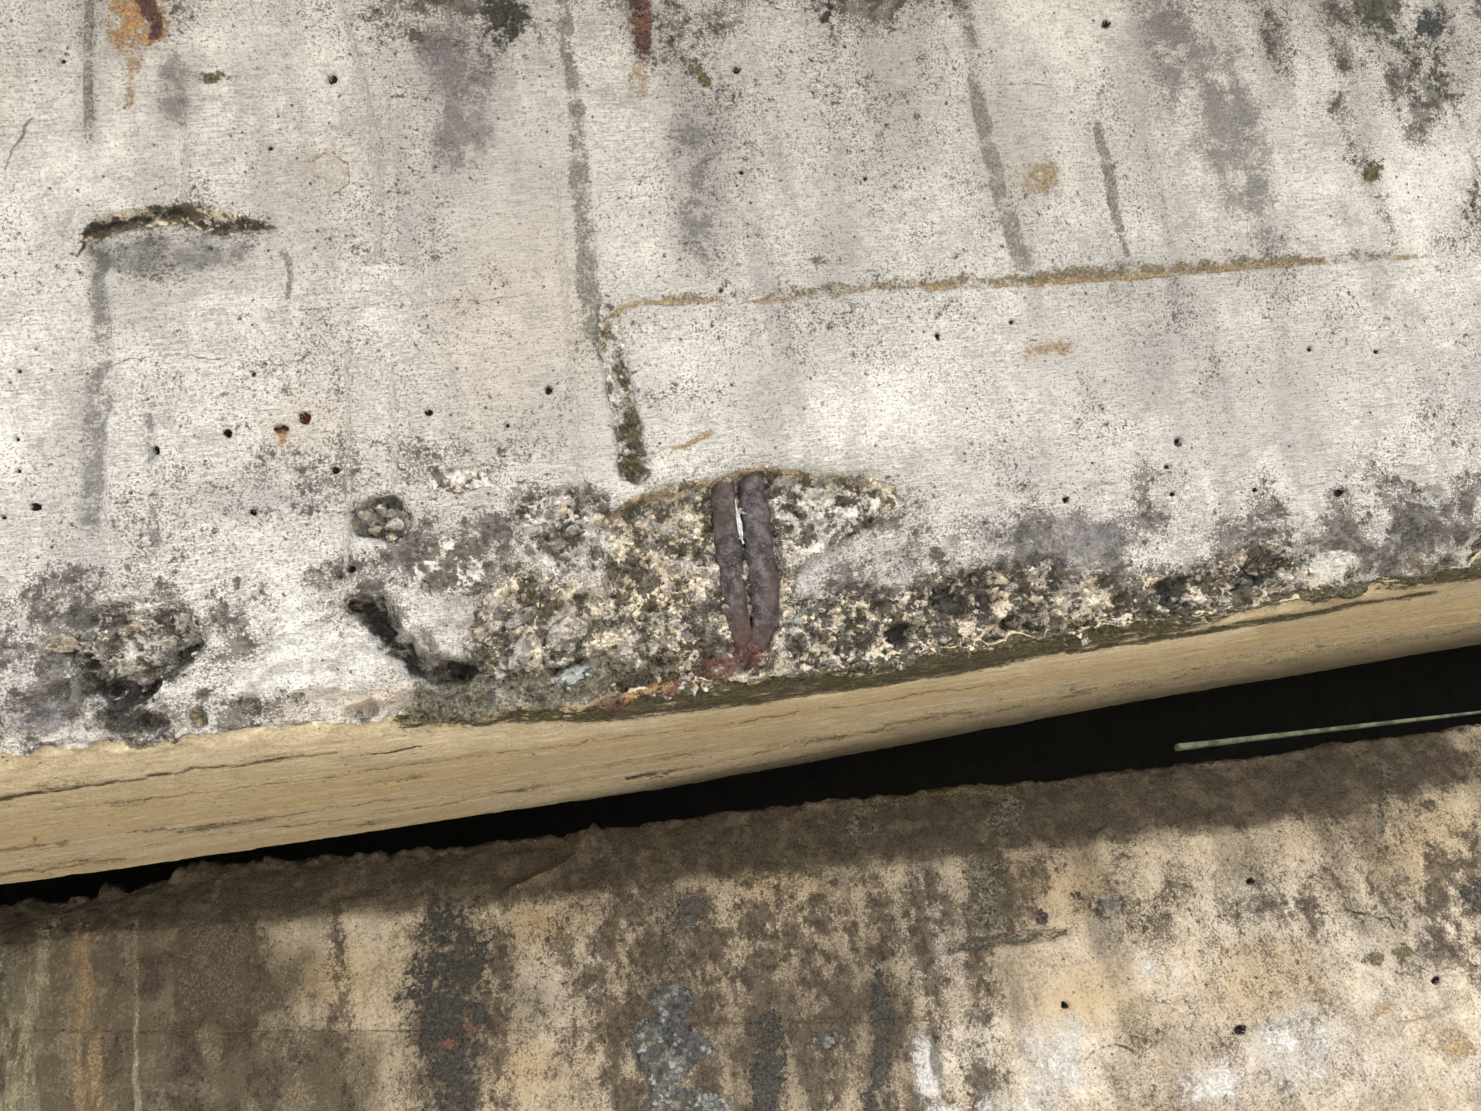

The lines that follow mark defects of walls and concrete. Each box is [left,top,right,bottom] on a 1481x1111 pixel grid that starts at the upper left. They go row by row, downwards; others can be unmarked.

rust [107,0,170,106]
spalling [79,202,276,243]
water stain [555,0,605,342]
rust [625,0,653,97]
water stain [1093,122,1130,257]
water stain [1141,0,1268,214]
spalling [345,463,1319,702]
spalling [43,601,208,736]
water stain [0,914,103,1111]
water stain [745,1002,793,1111]
water stain [860,949,959,1111]
water stain [1178,1058,1241,1105]